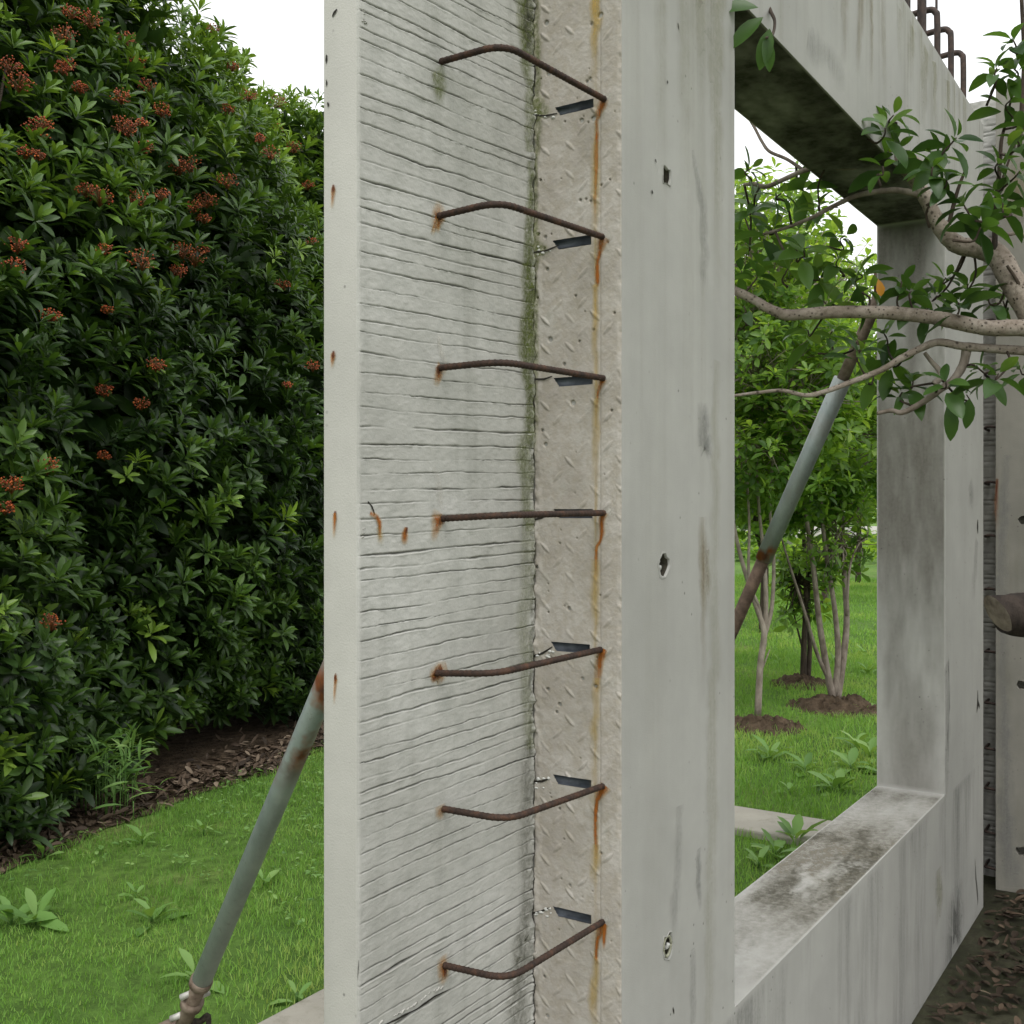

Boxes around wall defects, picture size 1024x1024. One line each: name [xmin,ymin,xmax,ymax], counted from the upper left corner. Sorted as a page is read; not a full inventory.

crack [533,3,557,154]
rust [594,100,608,200]
crack [533,180,559,289]
rust [594,237,608,322]
crack [533,331,552,467]
rust [594,516,605,589]
rust [596,649,606,680]
crack [532,638,552,1024]
rust [594,786,608,862]
water stain [751,822,898,922]
rust [595,924,606,962]